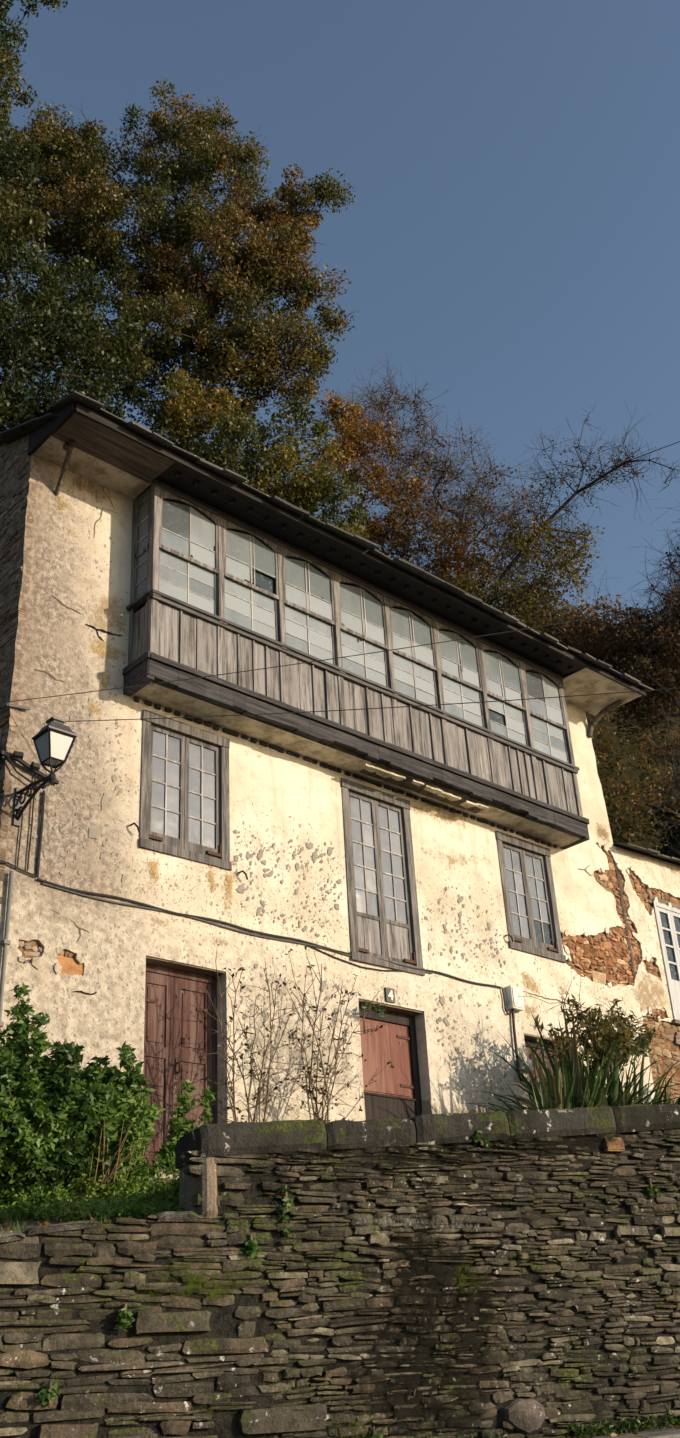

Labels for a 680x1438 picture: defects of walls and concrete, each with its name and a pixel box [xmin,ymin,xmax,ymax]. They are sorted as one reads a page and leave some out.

spalling [17,940,89,976]
spalling [550,842,680,988]